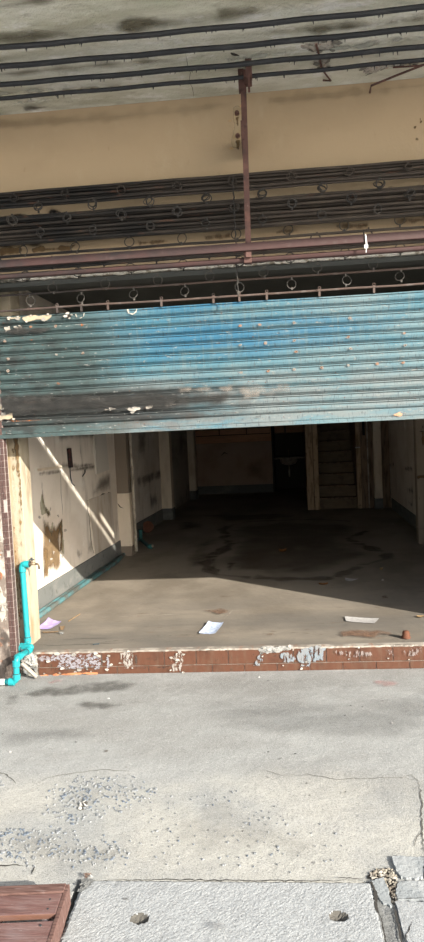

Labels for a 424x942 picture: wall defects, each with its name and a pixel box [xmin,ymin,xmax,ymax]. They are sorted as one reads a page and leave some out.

spalling [359,63,424,93]
damp [12,438,22,525]
damp [43,511,62,576]
peeling [21,649,133,677]
peeling [254,645,372,678]
crack [305,774,424,847]